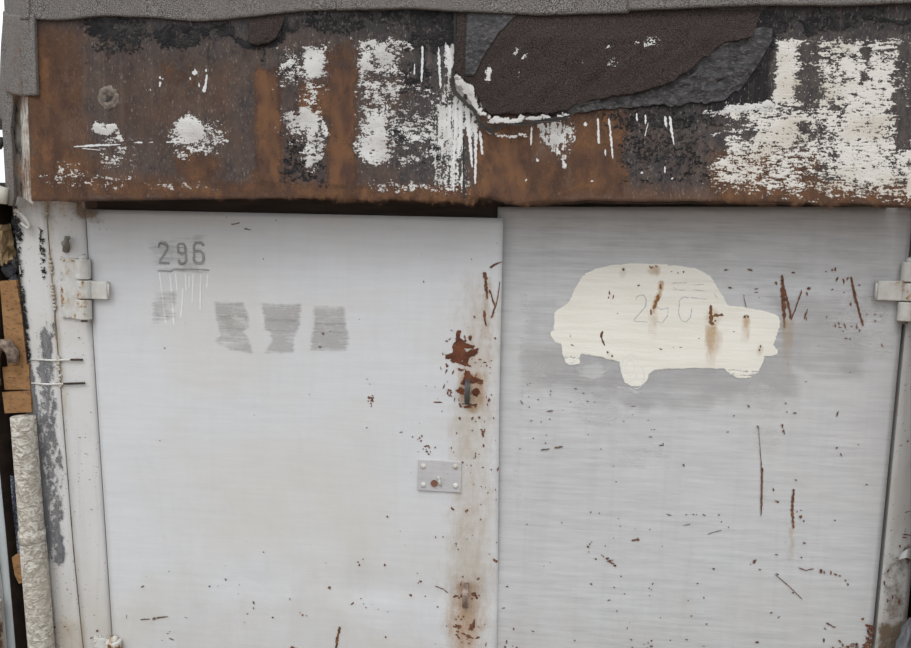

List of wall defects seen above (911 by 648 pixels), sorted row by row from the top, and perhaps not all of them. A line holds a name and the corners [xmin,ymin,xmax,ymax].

corrosion [15,30,628,205]
peeling [702,36,911,205]
corrosion [710,151,911,207]
corrosion [433,327,492,412]
peeling [23,321,65,566]
corrosion [446,615,486,647]
corrosion [838,588,904,648]